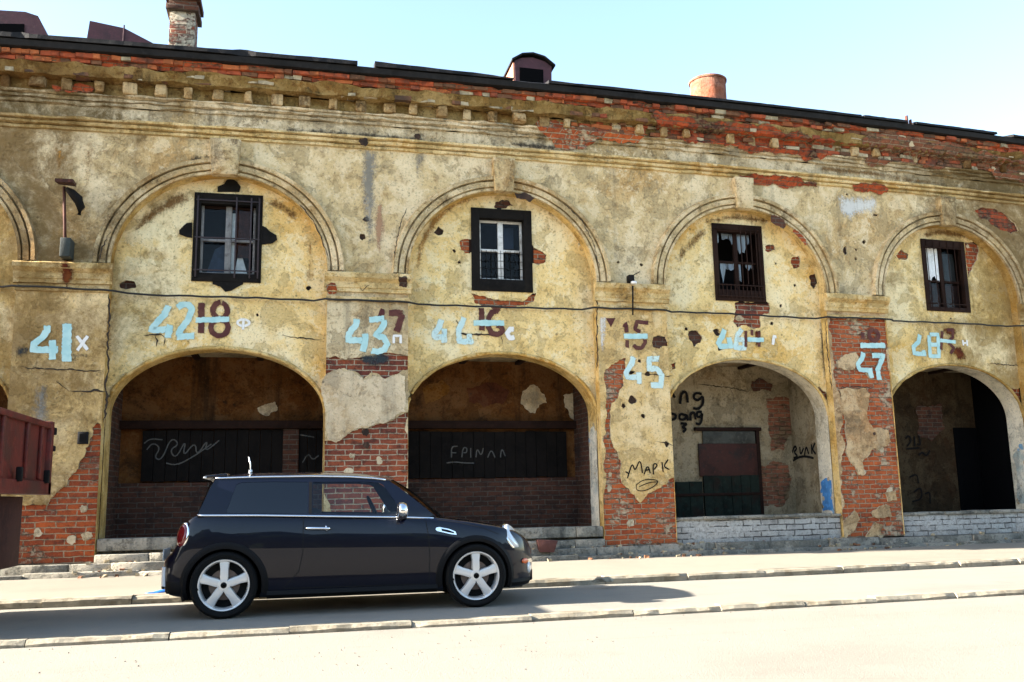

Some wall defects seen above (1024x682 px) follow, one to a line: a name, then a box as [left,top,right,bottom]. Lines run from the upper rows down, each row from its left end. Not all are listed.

crack [25,295,111,422]
flaking render [326,353,408,379]
flaking render [453,239,469,264]
flaking render [471,293,536,309]
flaking render [533,247,546,265]
flaking render [733,301,782,329]
flaking render [975,207,1019,234]
flaking render [18,422,101,565]
flaking render [324,412,408,512]
flaking render [589,358,677,546]
flaking render [751,378,792,507]
flaking render [818,318,904,538]